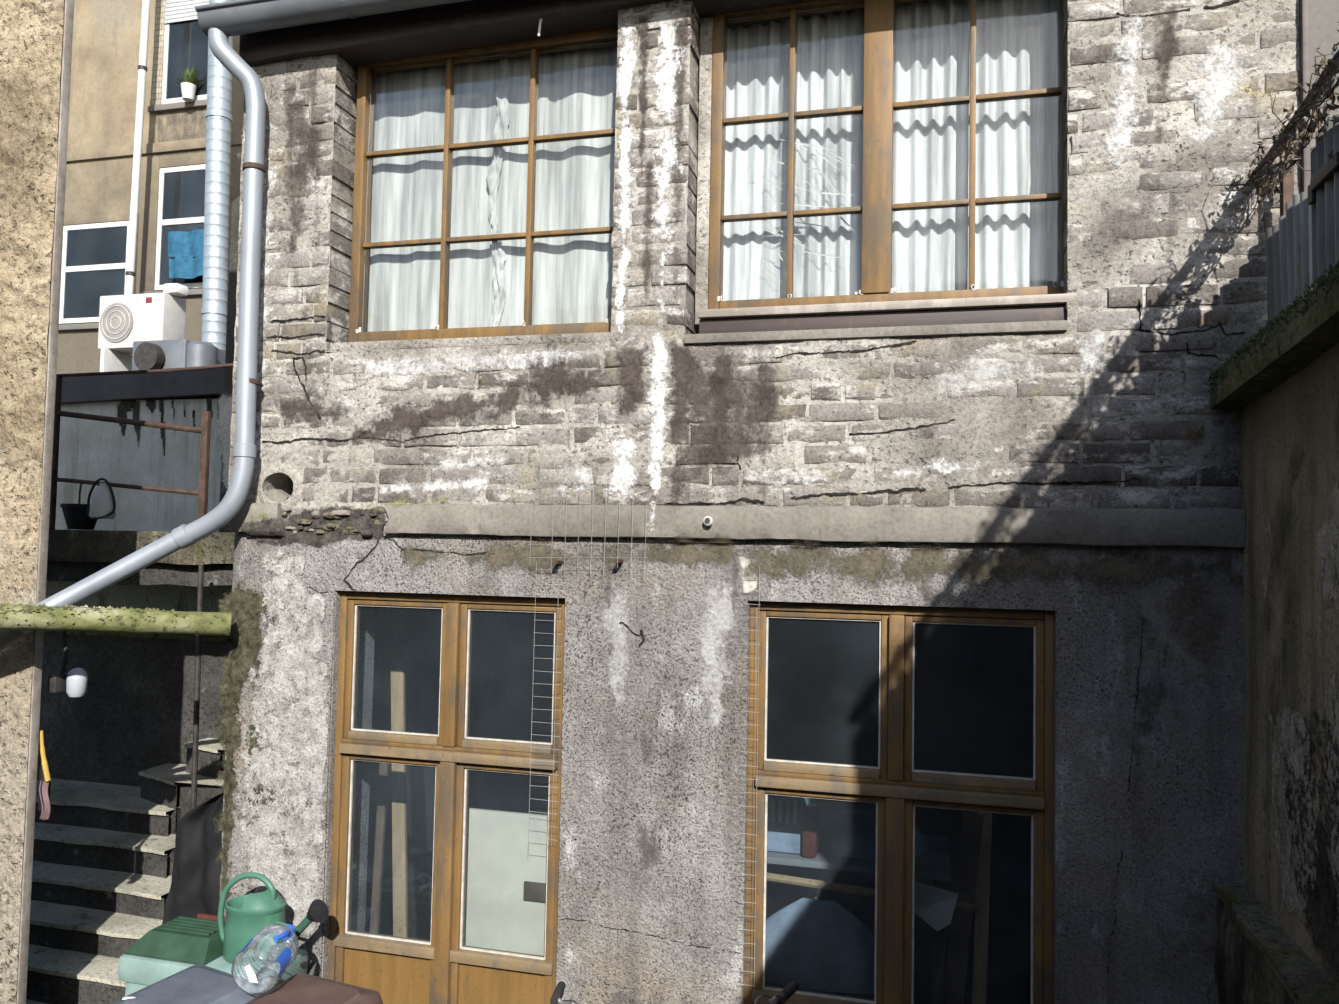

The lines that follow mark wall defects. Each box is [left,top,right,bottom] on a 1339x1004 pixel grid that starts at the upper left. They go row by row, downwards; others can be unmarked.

damp [117,397,220,456]
damp [281,392,348,421]
crack [262,315,520,444]
damp [352,350,603,442]
damp [466,7,1247,723]
damp [379,456,505,493]
crack [267,536,495,623]
damp [403,546,438,566]
peeling [1314,481,1339,619]
peeling [1268,673,1339,983]